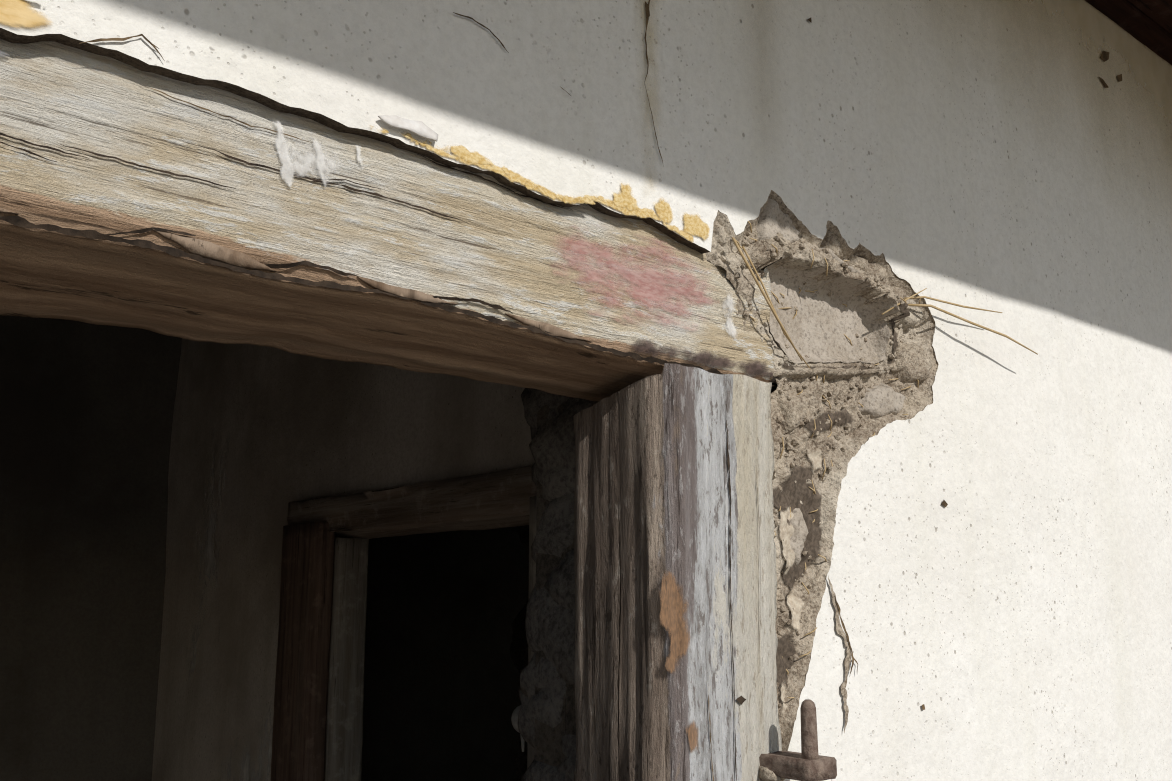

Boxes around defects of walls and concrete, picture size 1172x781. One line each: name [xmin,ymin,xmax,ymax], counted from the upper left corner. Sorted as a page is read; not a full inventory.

peeling [0,0,50,27]
crack [644,0,663,162]
spalling [378,115,937,736]
crack [707,404,760,781]